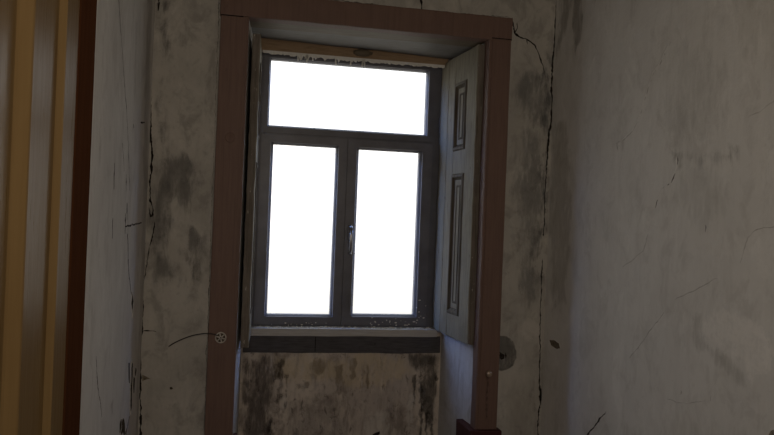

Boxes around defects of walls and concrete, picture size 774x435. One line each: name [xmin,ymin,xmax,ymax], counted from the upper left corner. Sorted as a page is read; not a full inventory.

crack [112,7,156,334]
crack [536,259,544,435]
peeling [120,362,151,435]
crack [136,366,144,435]
water stain [243,353,436,435]